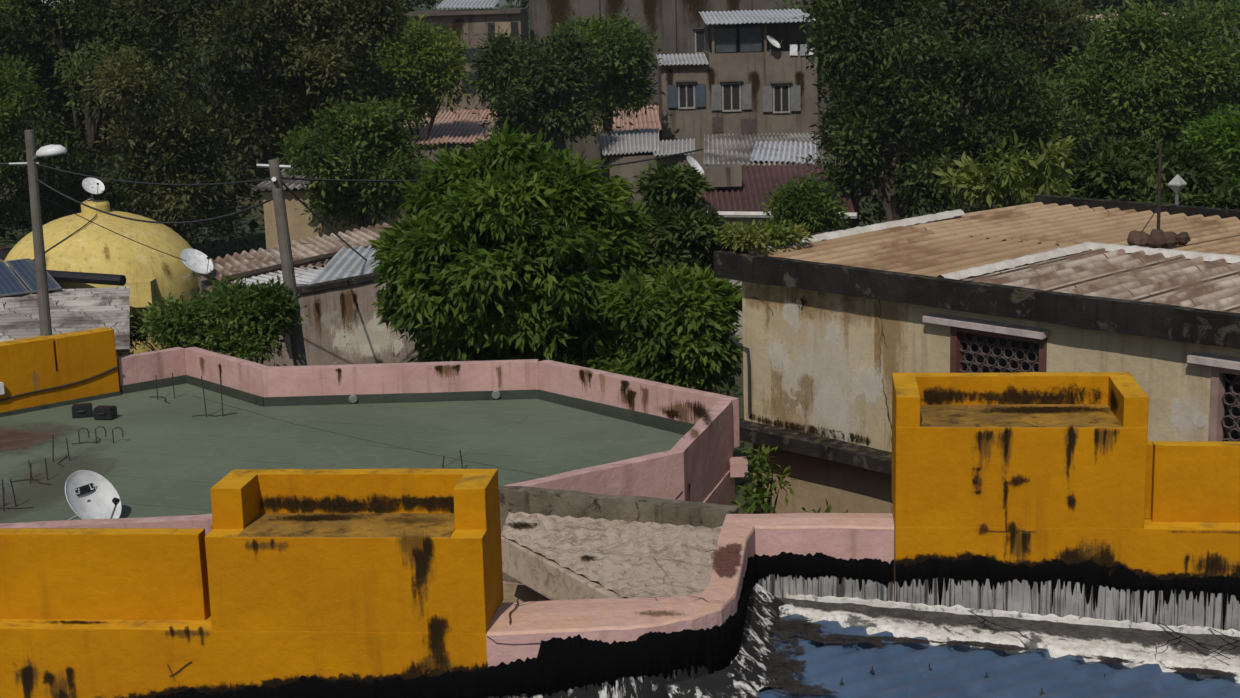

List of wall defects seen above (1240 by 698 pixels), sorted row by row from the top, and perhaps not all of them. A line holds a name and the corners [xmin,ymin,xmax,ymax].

leakage [579,369,592,385]
leakage [621,380,648,410]
leakage [662,401,713,437]
leakage [751,413,870,446]
leakage [920,384,1118,477]
leakage [977,427,1030,563]
leakage [260,494,454,595]
leakage [1056,544,1114,573]
leakage [1184,554,1240,576]
leakage [16,660,76,698]